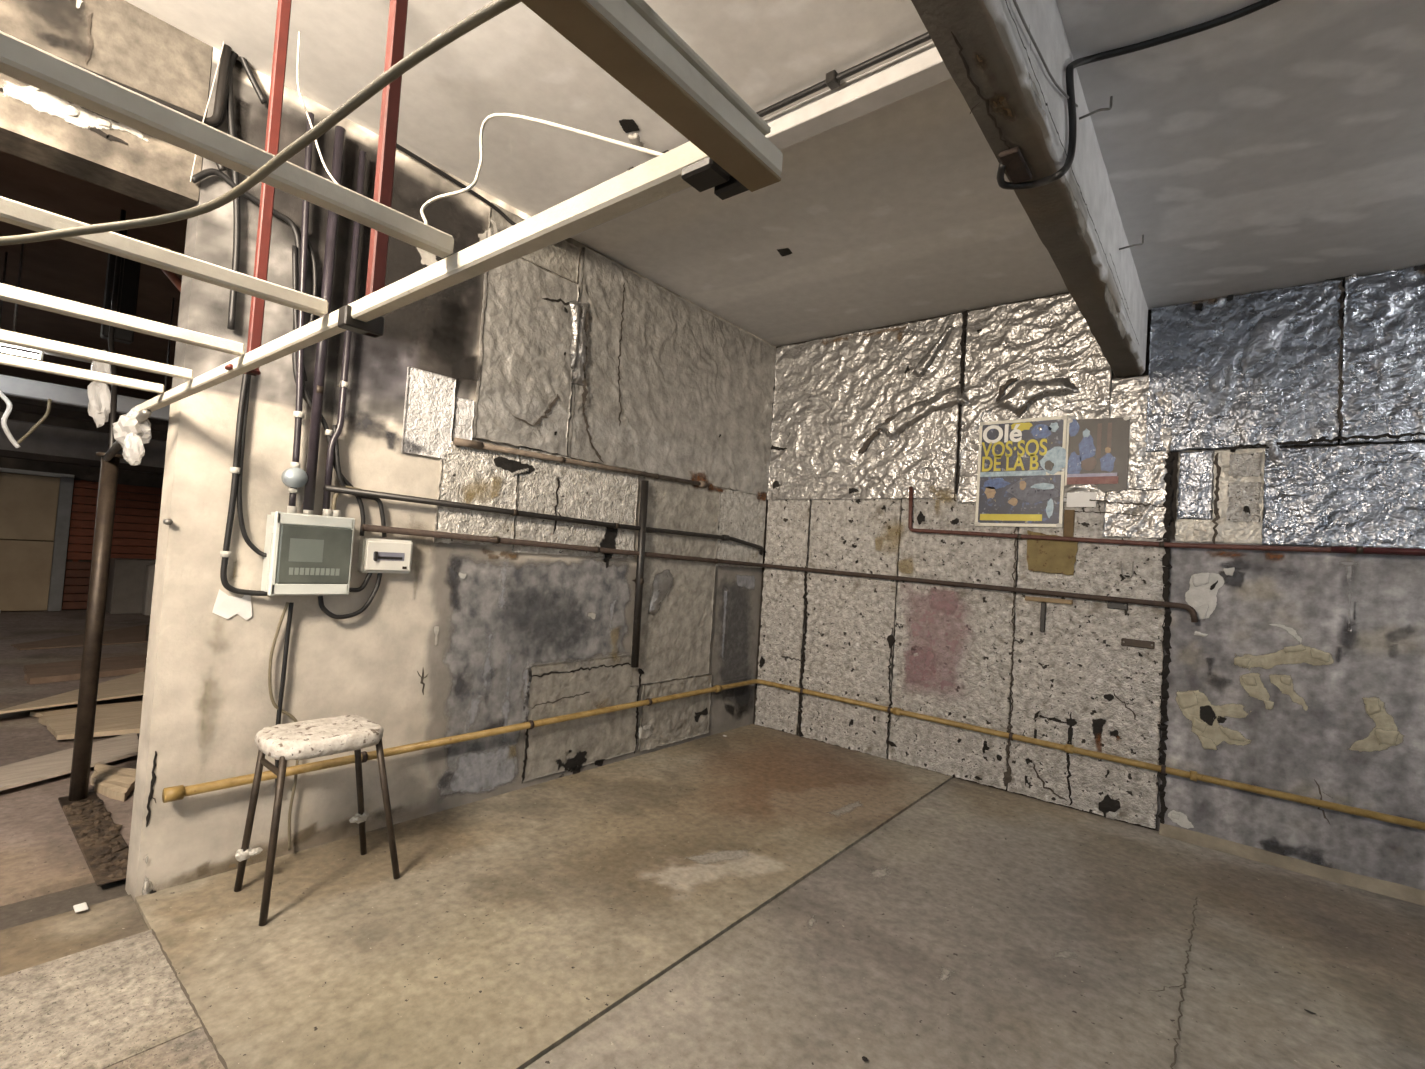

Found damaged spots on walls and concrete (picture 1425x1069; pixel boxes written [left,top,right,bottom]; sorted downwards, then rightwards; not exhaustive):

crack [514,283,625,463]
peeling [1185,567,1235,637]
peeling [1175,634,1334,750]
peeling [1347,697,1404,752]
crack [1147,897,1198,1069]